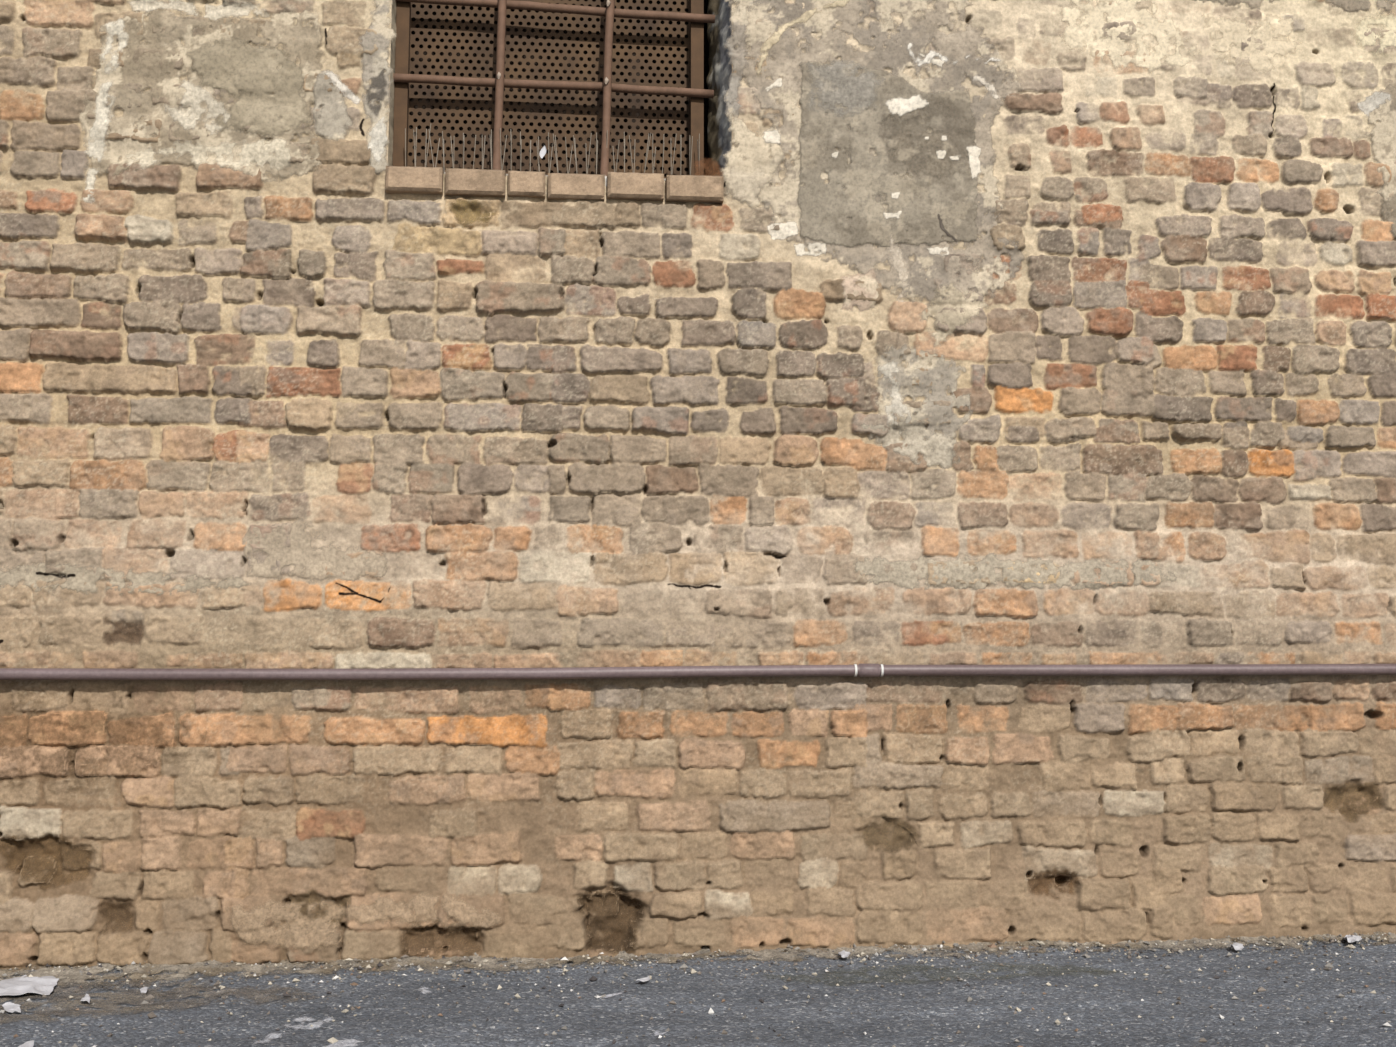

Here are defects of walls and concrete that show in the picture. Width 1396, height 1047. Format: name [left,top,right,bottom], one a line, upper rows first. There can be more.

spalling [1324,783,1381,821]
spalling [0,835,91,889]
spalling [578,887,643,953]